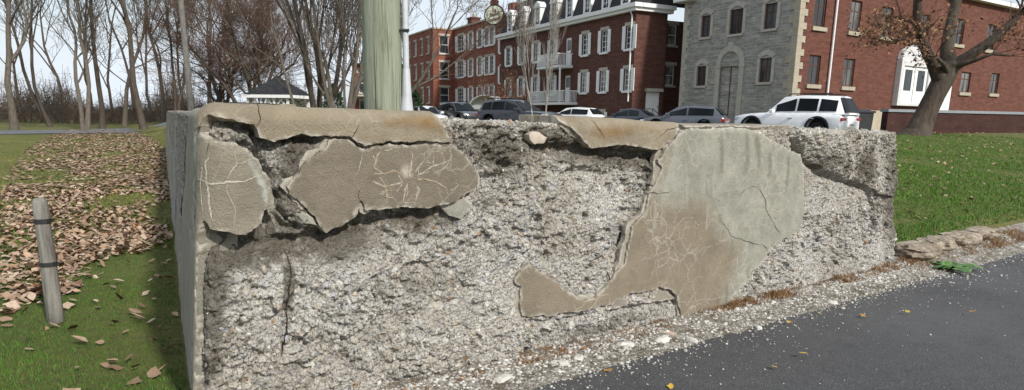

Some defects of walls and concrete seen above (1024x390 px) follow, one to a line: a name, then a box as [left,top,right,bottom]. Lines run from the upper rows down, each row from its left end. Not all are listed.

crack [198,144,262,227]
crack [307,127,464,198]
crack [281,249,292,357]
spalling [192,115,897,390]
crack [638,186,780,303]